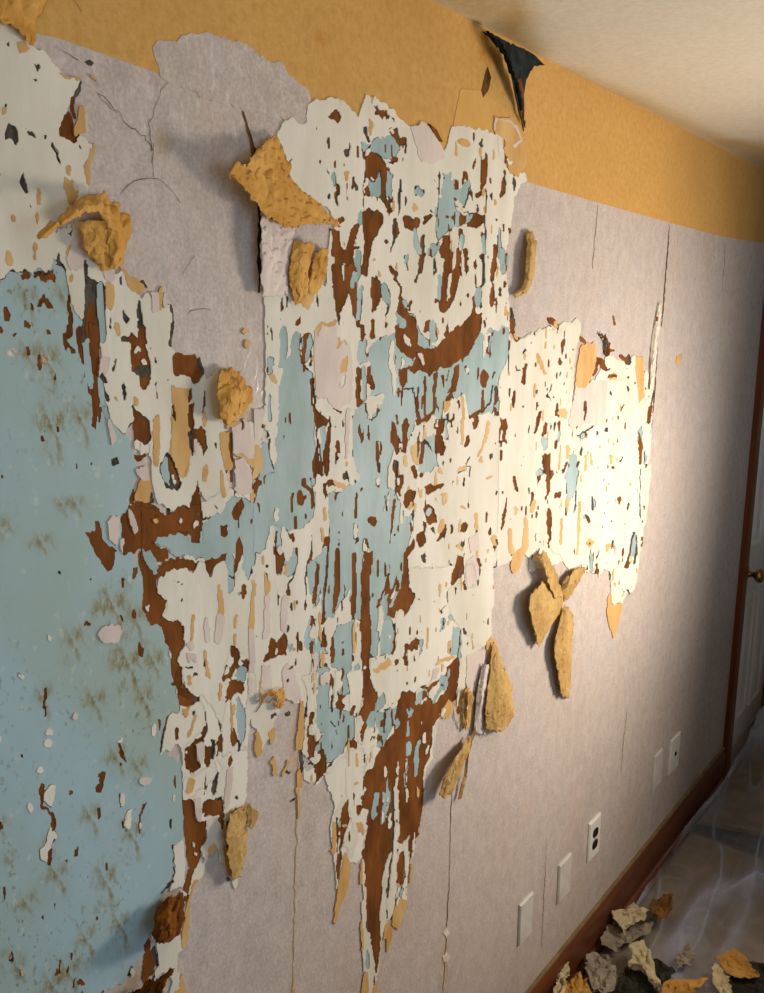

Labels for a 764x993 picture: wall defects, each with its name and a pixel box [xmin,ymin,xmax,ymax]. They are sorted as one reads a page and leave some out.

peeling [0,24,251,993]
crack [98,86,180,202]
peeling [140,95,660,993]
spalling [495,36,545,121]